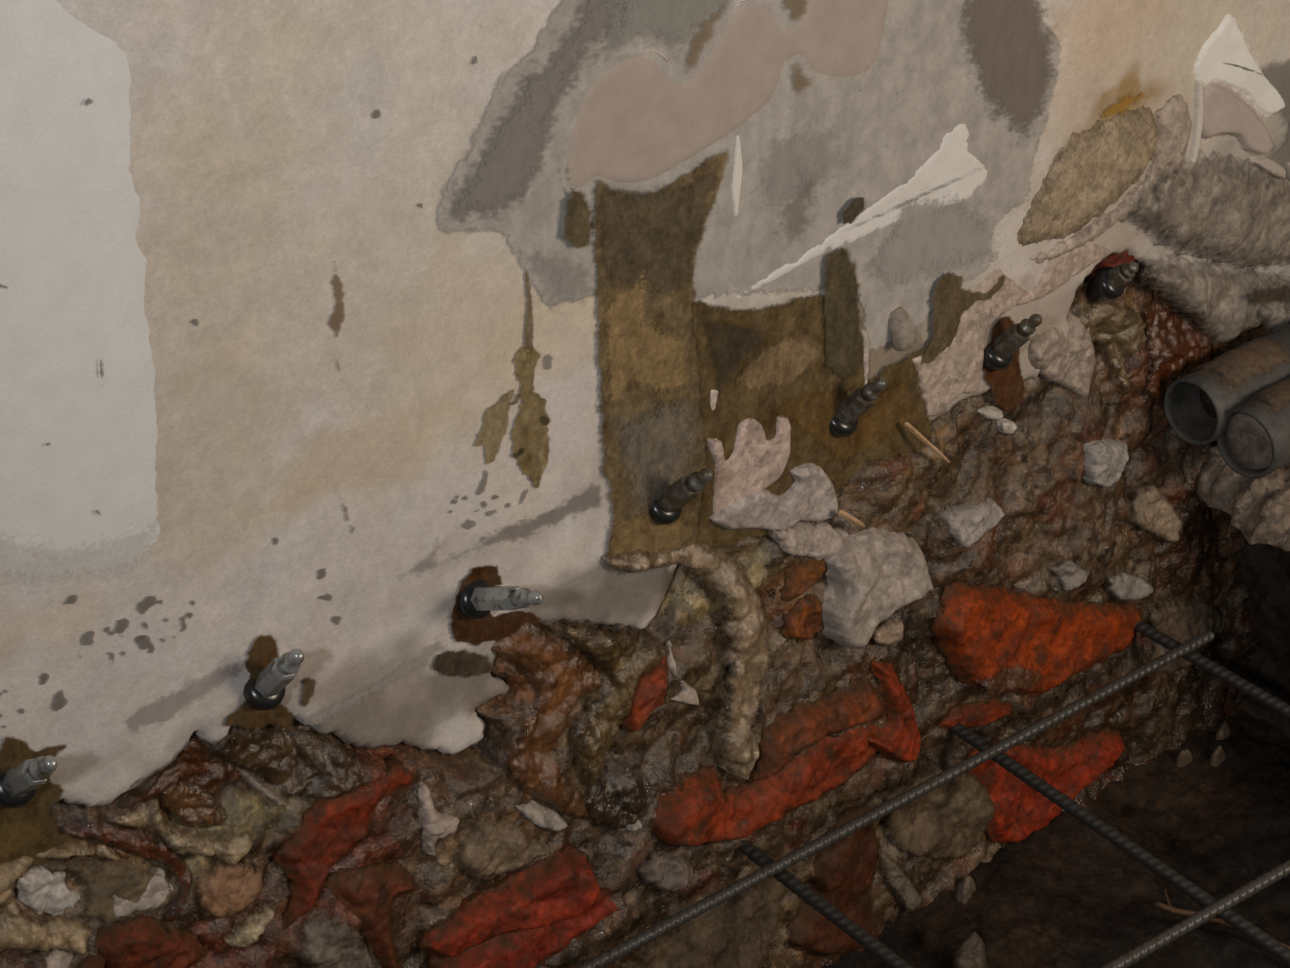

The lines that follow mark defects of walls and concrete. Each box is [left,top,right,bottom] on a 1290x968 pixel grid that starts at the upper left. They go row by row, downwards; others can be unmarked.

water stain [475,272,550,488]
water stain [563,152,1006,560]
water stain [962,0,1054,137]
spalling [908,94,1274,417]
peeling [1248,154,1290,182]
spalling [1,327,1290,968]